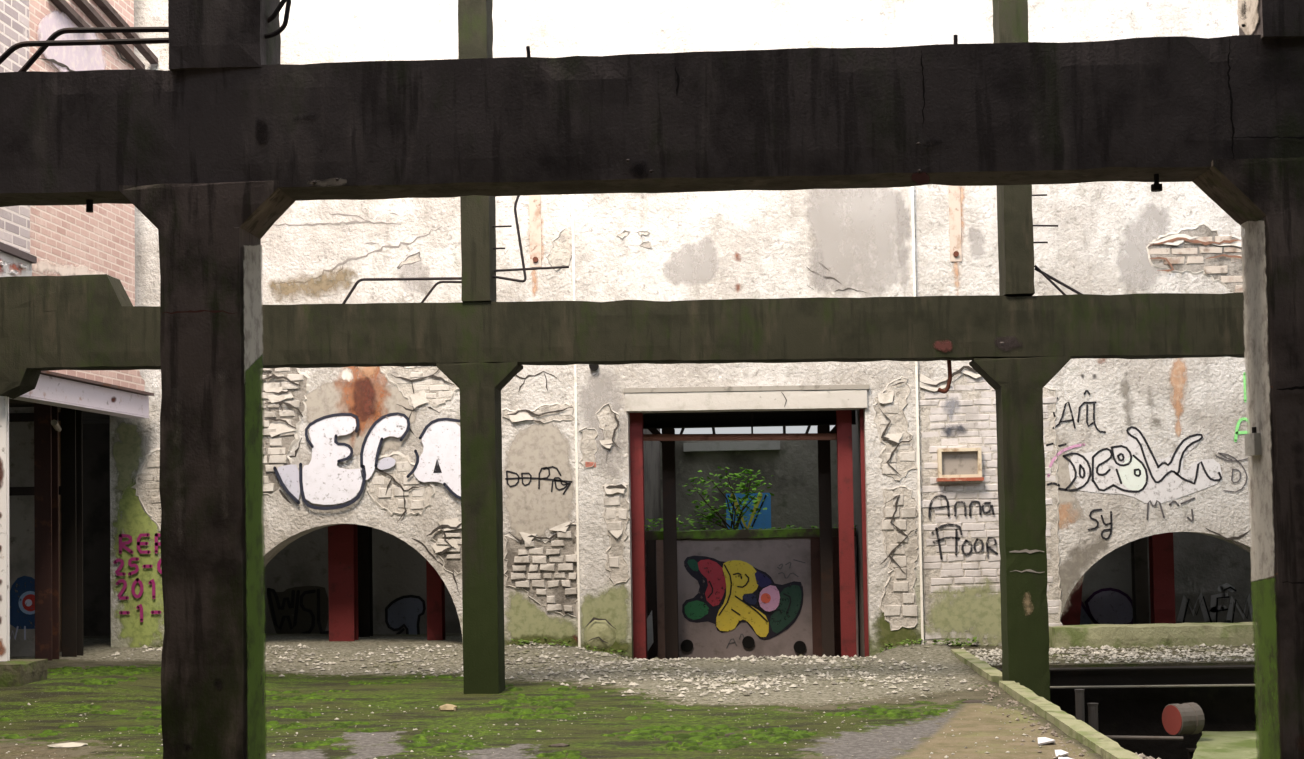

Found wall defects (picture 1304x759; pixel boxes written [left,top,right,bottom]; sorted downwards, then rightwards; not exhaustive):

flaking render [1145,222,1243,293]
corrosion [335,366,389,439]
flaking render [502,402,621,470]
crack [879,366,977,574]
corrosion [1171,358,1186,435]
flaking render [504,522,578,619]
flaking render [602,483,631,586]